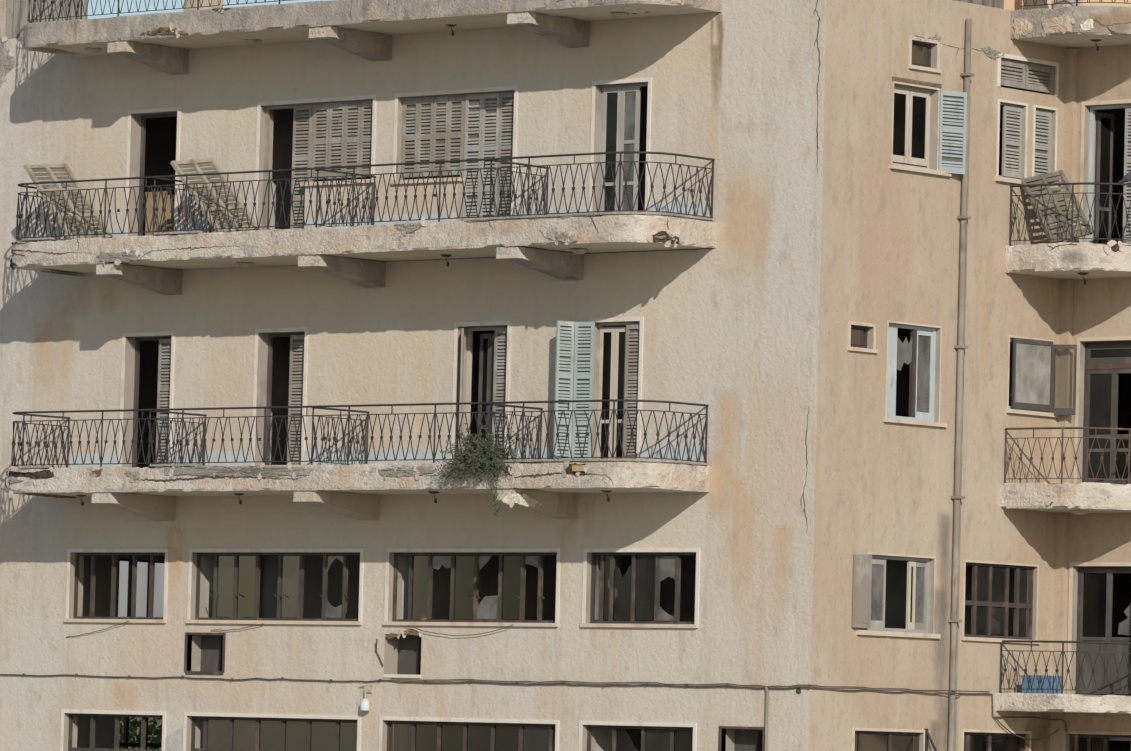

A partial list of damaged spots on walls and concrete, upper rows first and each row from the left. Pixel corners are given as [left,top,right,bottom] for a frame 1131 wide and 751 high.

peeling [1013,15,1094,39]
flaking render [0,36,16,88]
flaking render [981,47,1005,61]
crack [812,0,820,172]
peeling [96,248,140,265]
peeling [554,227,578,245]
spalling [647,229,681,248]
spalling [1104,240,1123,255]
peeling [164,462,313,480]
peeling [378,460,435,480]
crack [801,407,809,522]
spalling [5,467,78,498]